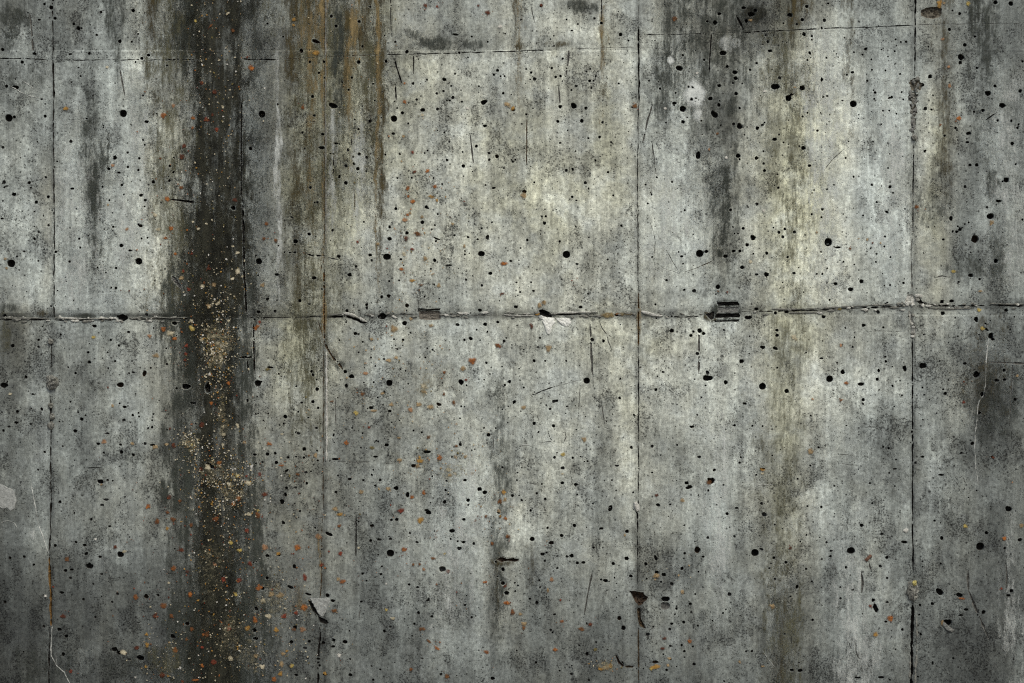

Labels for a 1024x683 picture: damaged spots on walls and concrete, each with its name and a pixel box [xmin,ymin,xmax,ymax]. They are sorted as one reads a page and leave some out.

damp [654,0,767,129]
corrosion [274,0,389,429]
damp [708,143,742,264]
damp [142,0,294,683]
crack [974,340,989,482]